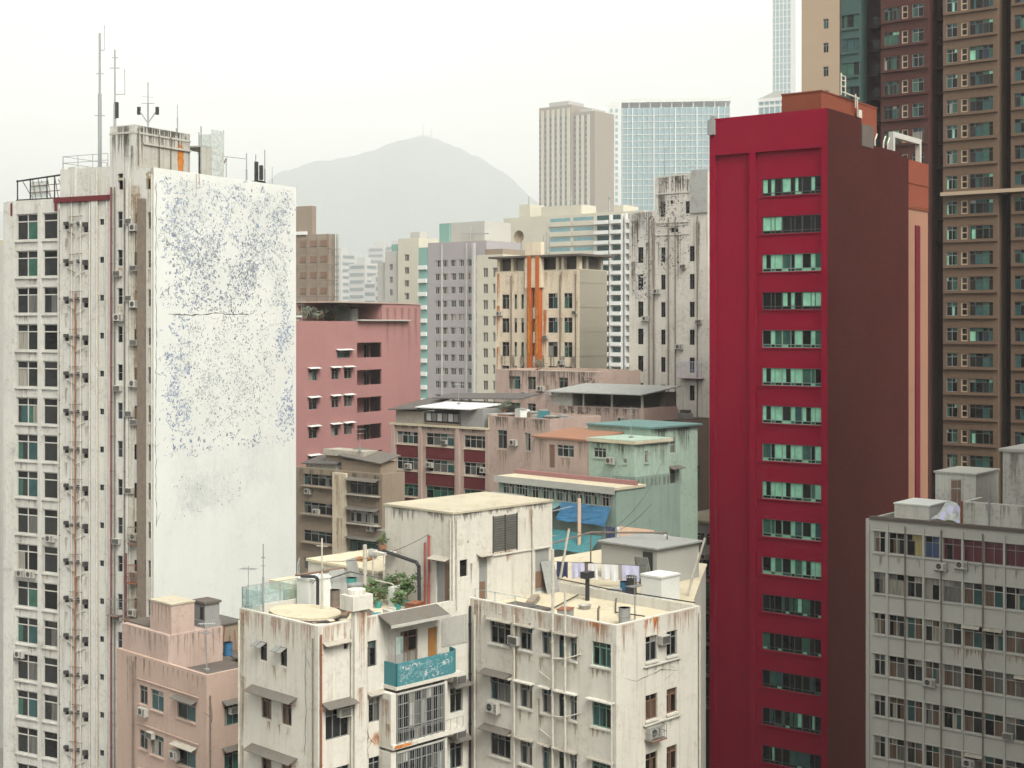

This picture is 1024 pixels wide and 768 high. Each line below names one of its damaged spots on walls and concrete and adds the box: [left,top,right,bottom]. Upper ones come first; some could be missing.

water stain [658,176,688,215]
water stain [631,213,659,282]
crack [155,286,248,379]
peeling [158,174,296,458]
peeling [399,653,453,685]